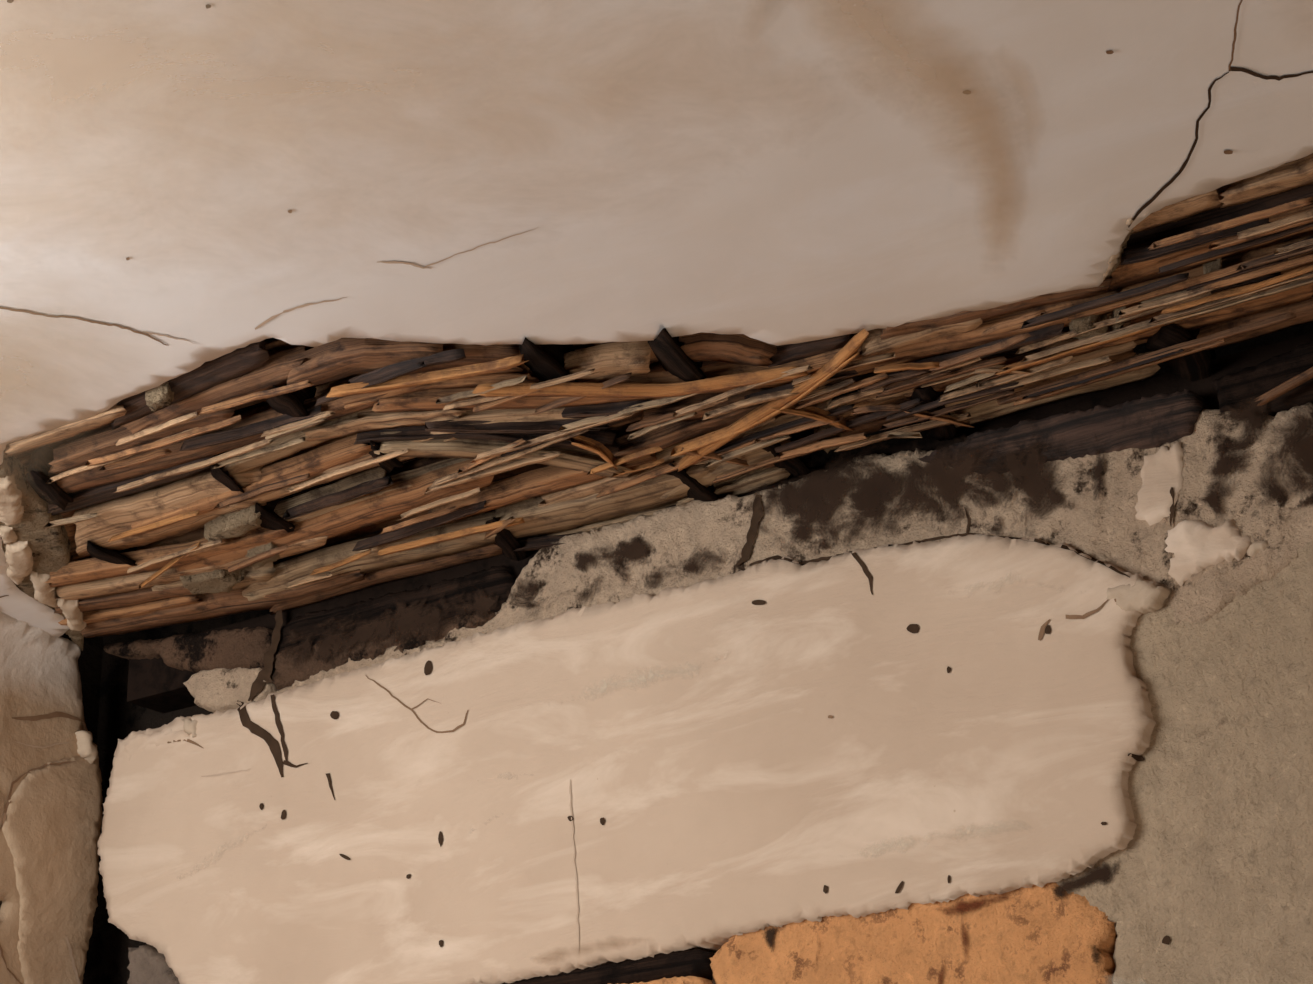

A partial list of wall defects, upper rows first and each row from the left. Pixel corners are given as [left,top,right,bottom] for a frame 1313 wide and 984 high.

crack [1128,0,1313,227]
spalling [1100,218,1134,291]
crack [0,307,197,346]
spalling [0,449,87,651]
damp [574,538,722,602]
damp [745,437,1072,550]
damp [1092,451,1105,499]
spalling [1107,442,1268,614]
damp [1201,397,1313,518]
crack [167,610,335,800]
crack [366,676,468,733]
crack [0,761,76,830]